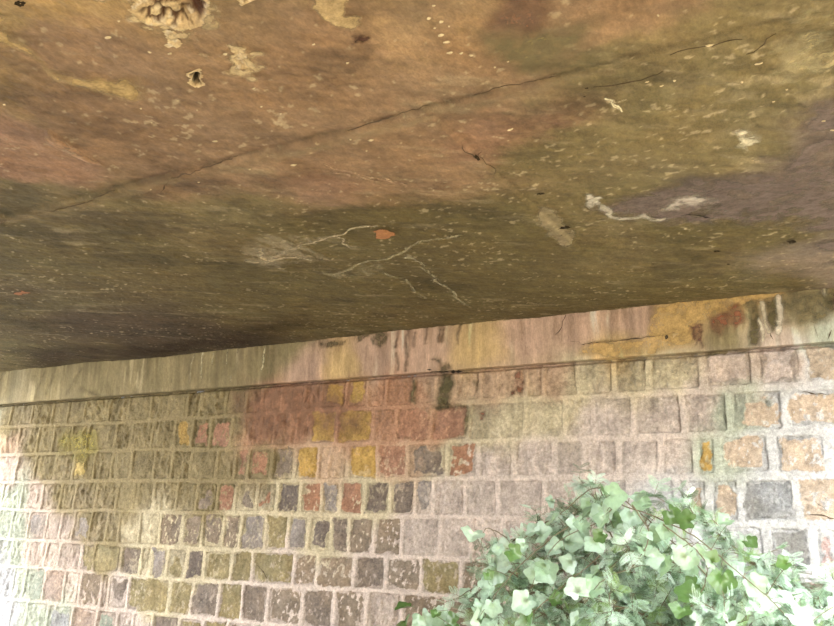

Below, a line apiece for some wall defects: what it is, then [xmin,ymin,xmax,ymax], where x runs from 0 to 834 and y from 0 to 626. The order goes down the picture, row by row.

spalling [118,0,219,55]
flaking render [313,0,361,29]
crack [473,75,560,96]
crack [596,33,776,87]
crack [348,105,427,131]
leakage [586,100,834,231]
leakage [583,288,834,357]
leakage [358,330,415,371]
leakage [434,359,454,410]